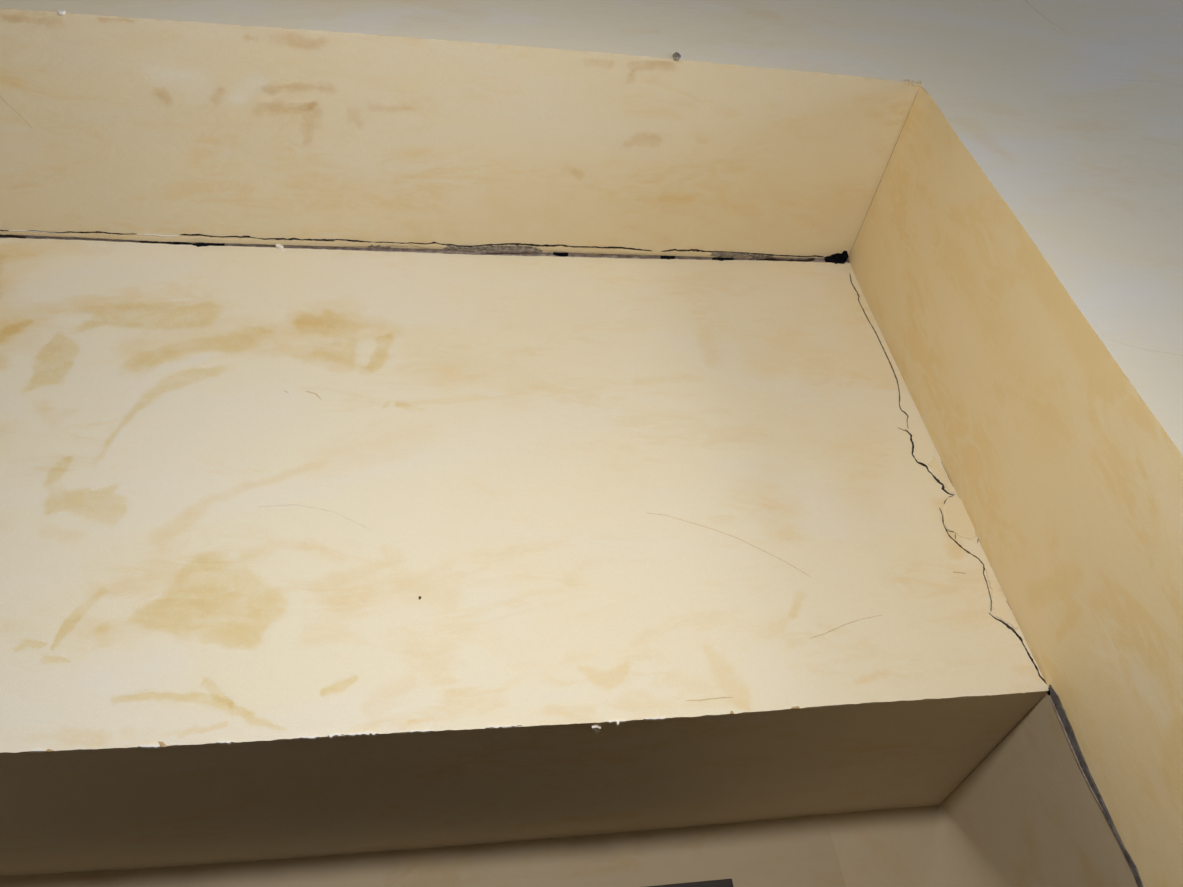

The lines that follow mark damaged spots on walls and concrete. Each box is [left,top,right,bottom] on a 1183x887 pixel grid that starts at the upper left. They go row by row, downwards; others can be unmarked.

crack [0,92,1047,801]